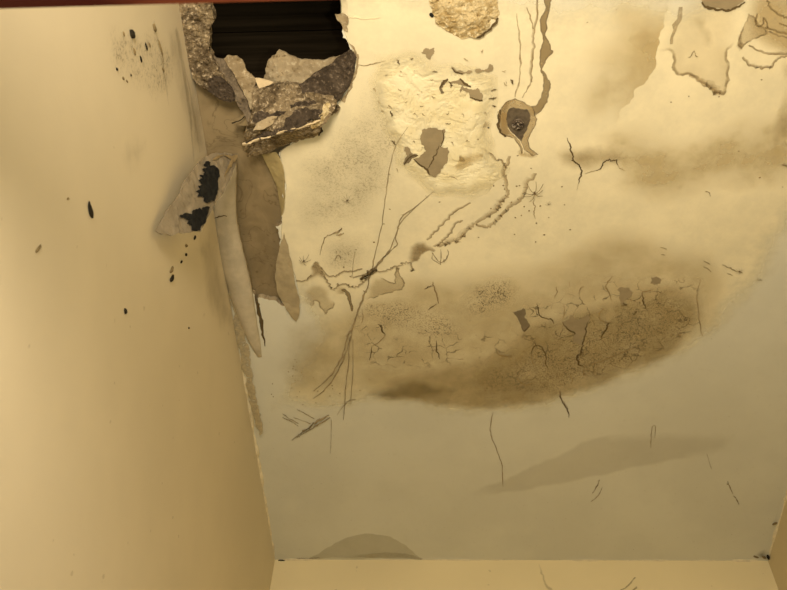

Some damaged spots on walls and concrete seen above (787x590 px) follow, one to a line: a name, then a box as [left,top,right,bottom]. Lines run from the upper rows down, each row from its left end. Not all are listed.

peeling [335,13,379,32]
flaking render [429,0,500,39]
peeling [156,3,359,321]
peeling [392,113,453,177]
crack [567,138,625,188]
water stain [281,0,787,407]
crack [537,282,584,324]
crack [361,313,385,360]
crack [559,276,651,417]
crack [490,414,503,483]